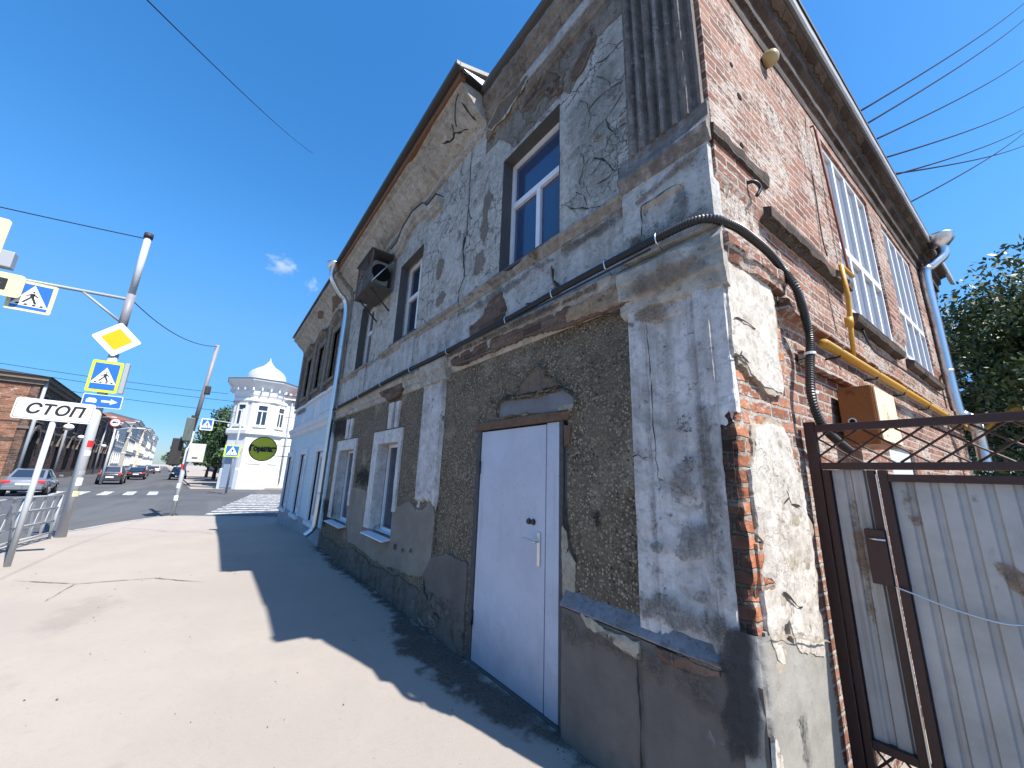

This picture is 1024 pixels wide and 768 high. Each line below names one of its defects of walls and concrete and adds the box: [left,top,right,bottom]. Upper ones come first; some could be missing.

crack [442,102,476,301]
flaking render [487,34,597,131]
crack [561,40,626,210]
flaking render [469,290,509,336]
flaking render [718,397,830,674]